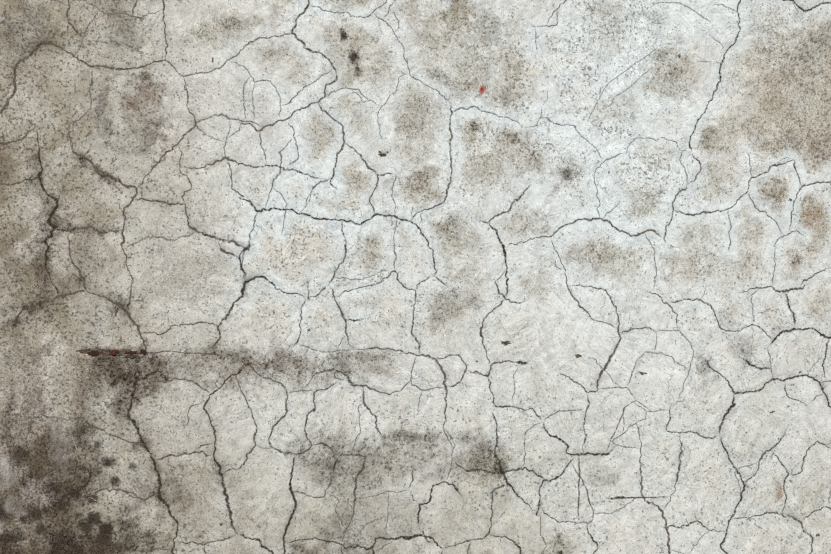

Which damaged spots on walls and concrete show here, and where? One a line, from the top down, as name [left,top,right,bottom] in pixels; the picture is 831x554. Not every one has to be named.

crack [783,0,830,14]
crack [627,0,741,181]
damp [0,482,138,554]
crack [0,0,612,554]
crack [552,243,694,404]
crack [606,417,705,554]
crack [623,400,713,439]
crack [509,125,831,286]
crack [650,253,831,433]
crack [711,429,831,554]